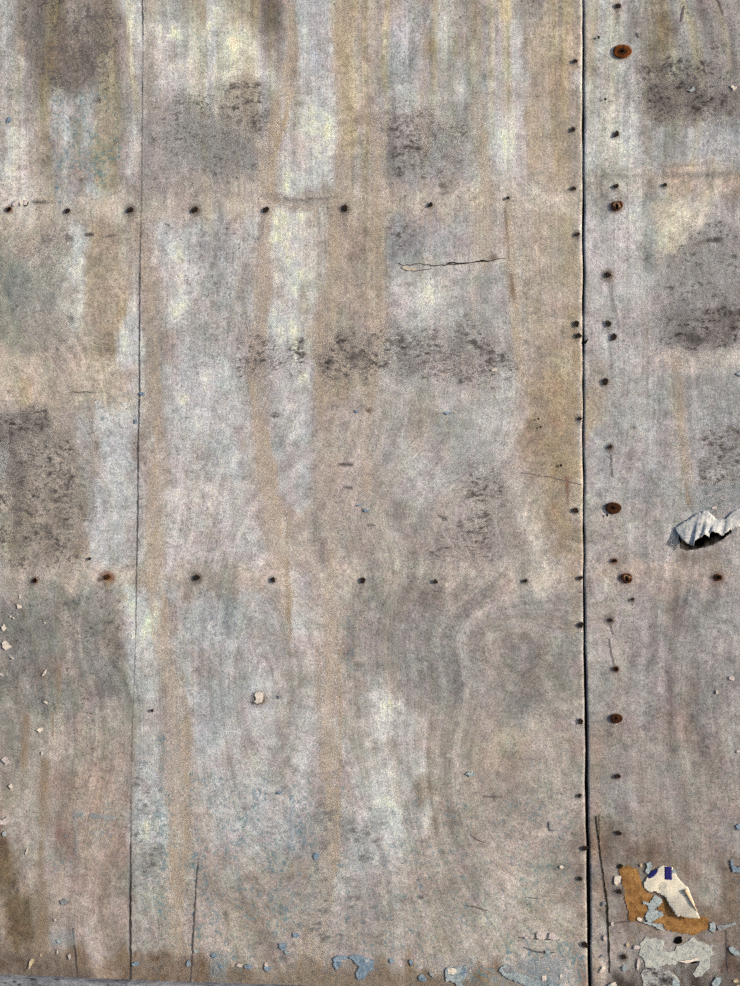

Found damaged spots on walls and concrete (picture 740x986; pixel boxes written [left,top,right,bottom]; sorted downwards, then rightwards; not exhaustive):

leakage [639,55,740,123]
crack [399,258,502,271]
leakage [658,220,740,366]
leakage [0,405,96,565]
peeling [675,506,740,551]
peeling [333,955,375,980]
peeling [499,965,563,986]
crack [596,814,642,973]
peeling [622,895,721,986]
peeling [710,922,737,932]